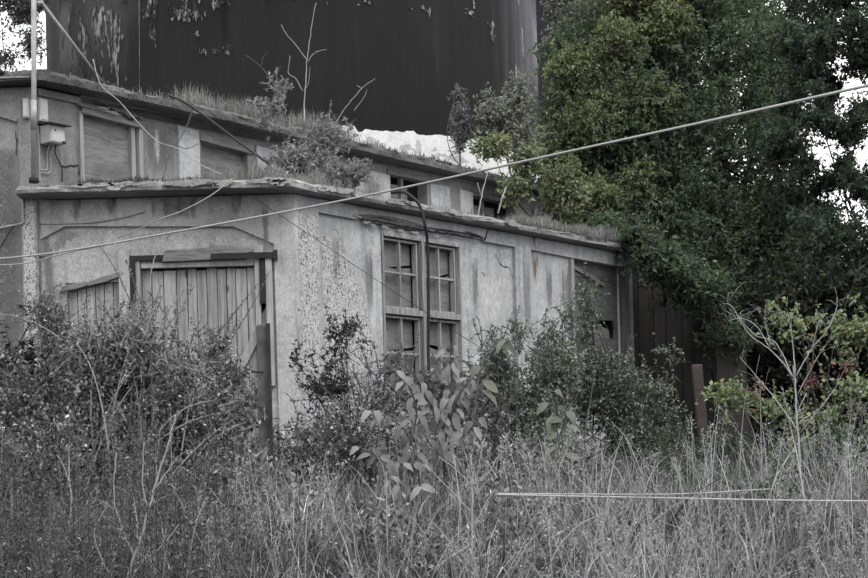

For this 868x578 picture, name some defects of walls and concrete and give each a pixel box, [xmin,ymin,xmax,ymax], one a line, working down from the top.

peeling [58,0,129,86]
peeling [141,0,234,57]